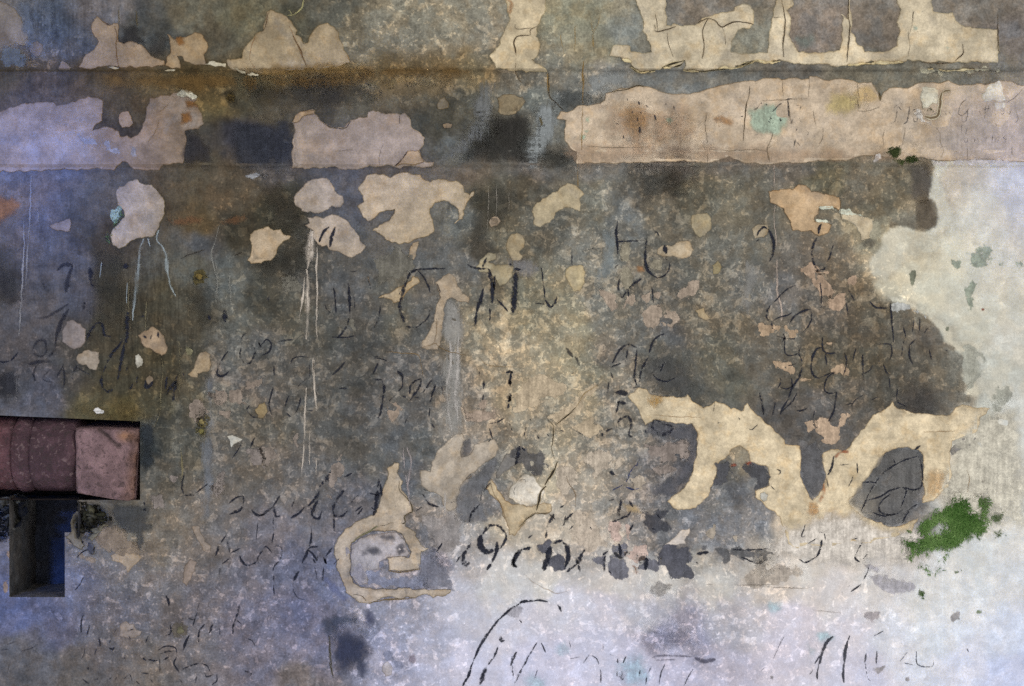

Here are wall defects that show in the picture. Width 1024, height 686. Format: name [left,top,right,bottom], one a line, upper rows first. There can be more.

peeling [59,9,350,76]
damp [177,90,197,99]
peeling [557,0,1024,165]
peeling [0,92,204,249]
peeling [291,109,474,303]
damp [816,206,863,222]
damp [917,199,937,228]
damp [951,245,1000,269]
damp [964,281,976,309]
spalling [628,387,989,548]
spalling [334,433,499,604]
damp [336,635,368,672]